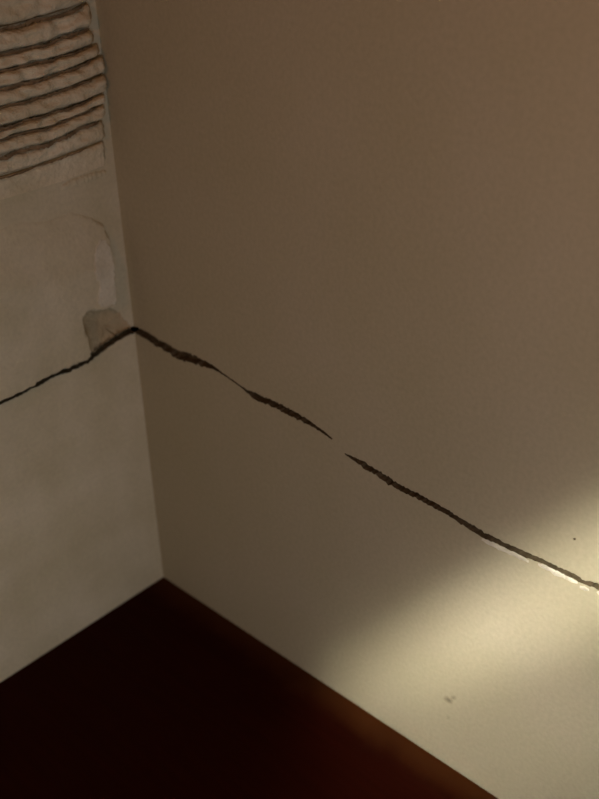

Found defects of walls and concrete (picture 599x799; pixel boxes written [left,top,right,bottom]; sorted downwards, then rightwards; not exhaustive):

crack [0,326,332,439]
crack [345,453,599,594]